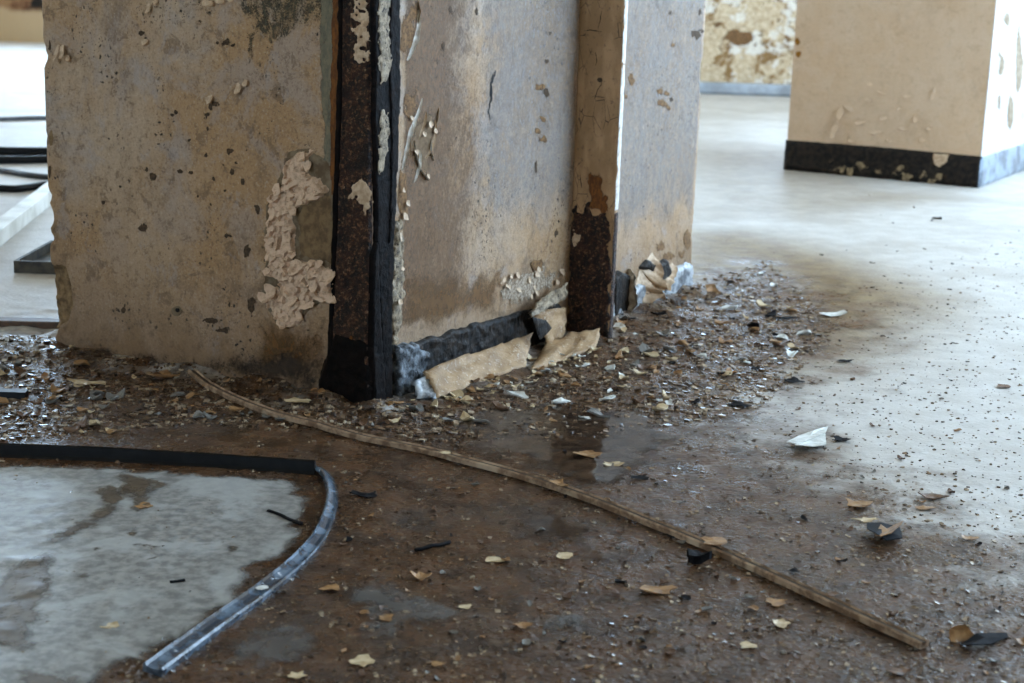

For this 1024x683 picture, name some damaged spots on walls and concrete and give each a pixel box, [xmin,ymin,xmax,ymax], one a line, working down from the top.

corrosion [330,0,338,195]
crack [488,70,496,118]
peeling [997,12,1024,130]
peeling [247,149,337,329]
spalling [385,88,768,426]
corrosion [566,173,618,338]
corrosion [318,334,373,403]